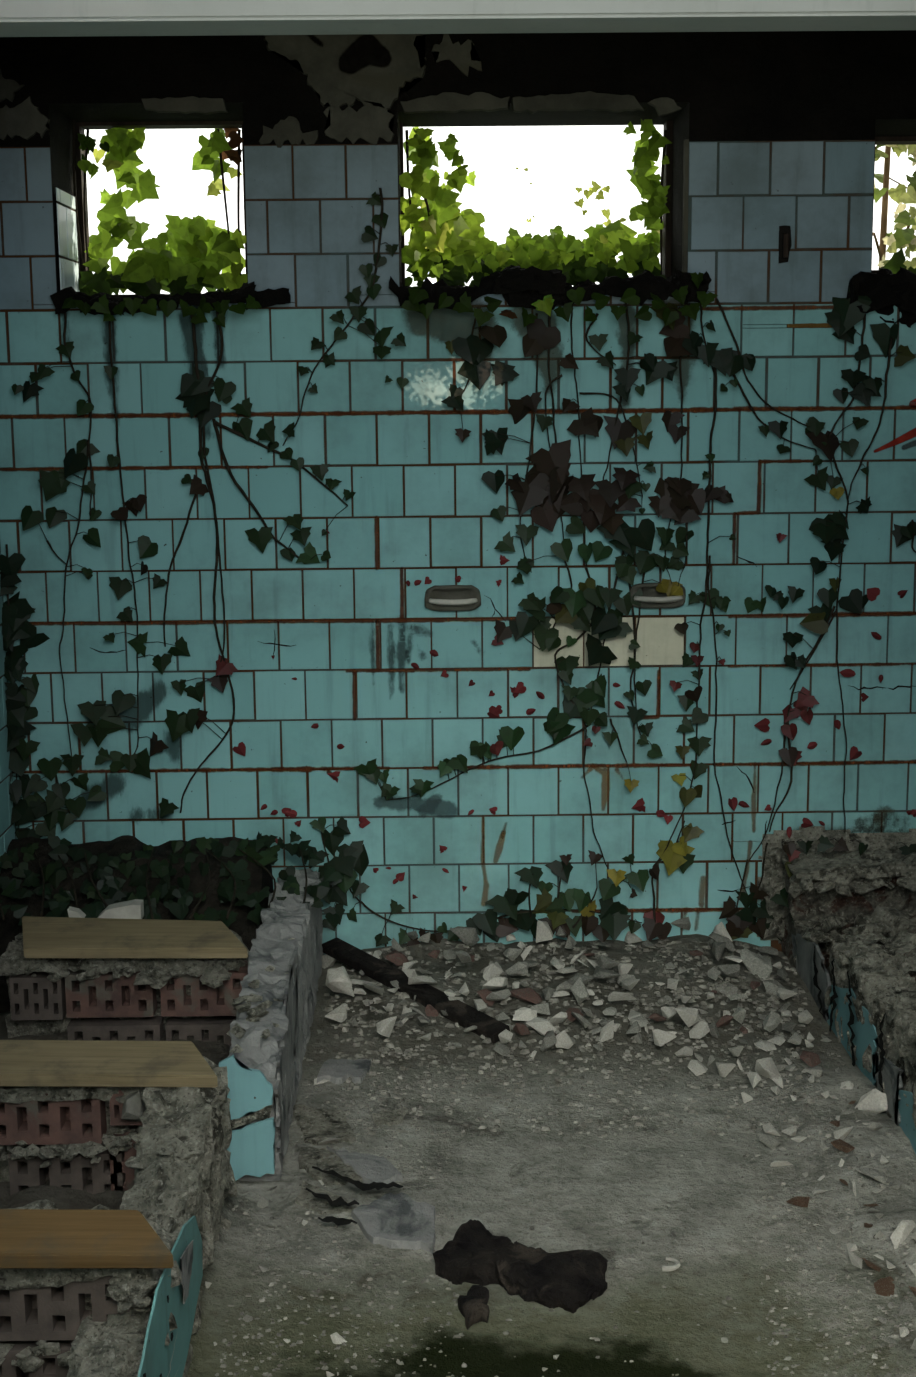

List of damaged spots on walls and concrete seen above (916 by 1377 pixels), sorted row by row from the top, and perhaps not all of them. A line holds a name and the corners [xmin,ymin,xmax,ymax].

spalling [259,34,682,148]
spalling [757,826,916,1022]
peeling [231,947,299,1159]
peeling [875,1052,904,1126]